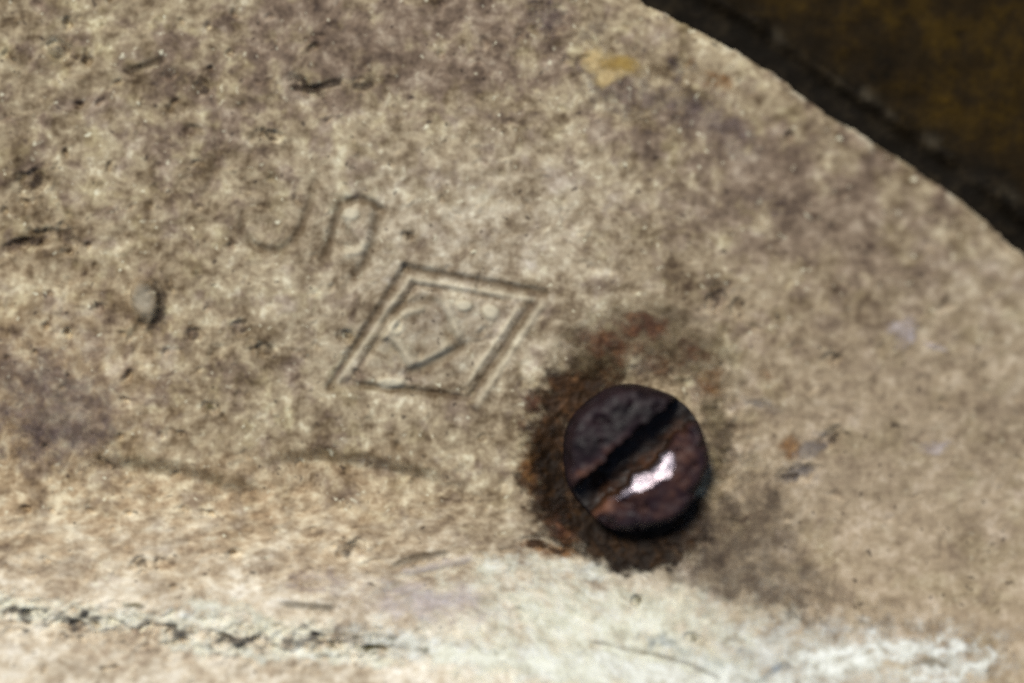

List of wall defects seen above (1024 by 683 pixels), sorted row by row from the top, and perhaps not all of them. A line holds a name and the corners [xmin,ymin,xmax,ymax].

rust [516,308,730,577]